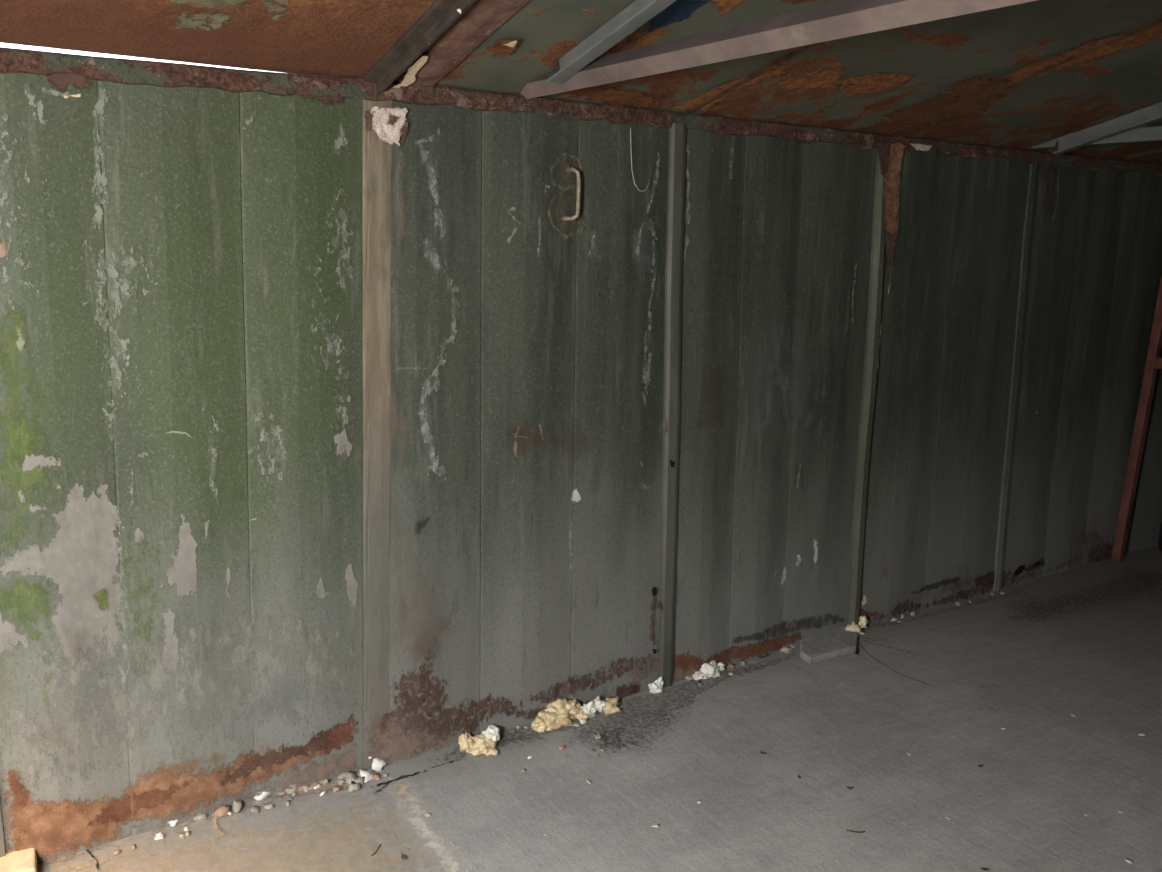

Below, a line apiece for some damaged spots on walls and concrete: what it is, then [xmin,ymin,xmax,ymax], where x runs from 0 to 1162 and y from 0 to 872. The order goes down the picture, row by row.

leakage [25,86,79,125]
leakage [90,87,109,234]
peeling [393,56,428,88]
efflorescence [423,167,444,270]
rust [877,23,1162,266]
peeling [76,237,157,447]
efflorescence [398,279,460,479]
peeling [0,450,153,674]
peeling [160,512,210,597]
rust [673,614,844,681]
rust [859,570,1015,620]
rust [4,649,659,860]